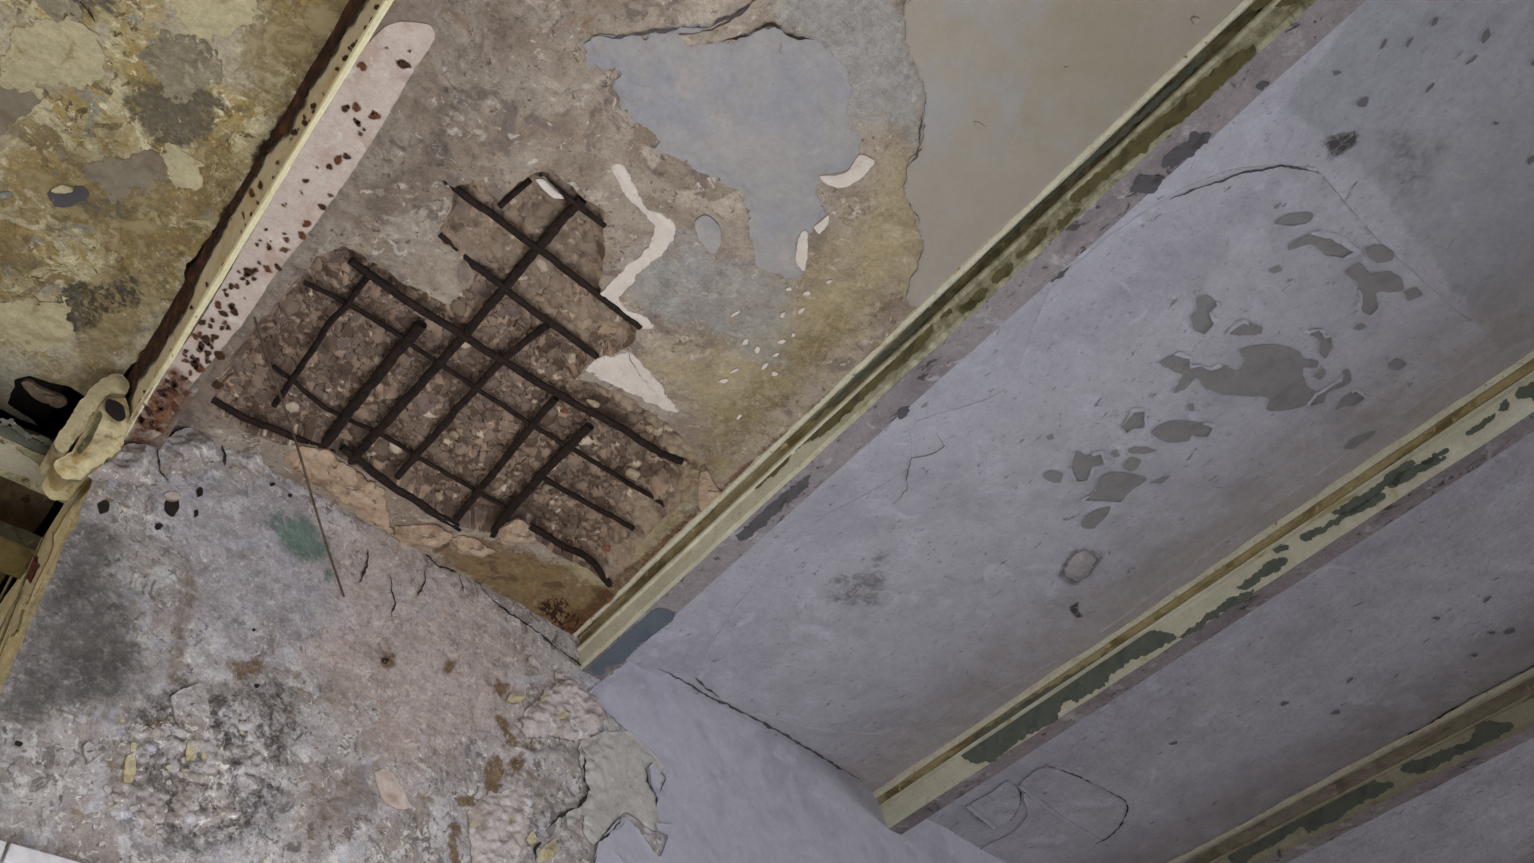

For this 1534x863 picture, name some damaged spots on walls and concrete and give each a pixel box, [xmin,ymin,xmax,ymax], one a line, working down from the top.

flaking render [0,0,107,135]
flaking render [139,0,264,105]
corrosion [124,0,381,446]
spalling [0,21,722,637]
corrosion [386,47,411,69]
flaking render [584,0,875,376]
peeling [755,0,1301,489]
peeling [1043,294,1369,529]
corrosion [560,507,700,637]
peeling [961,448,1449,764]
peeling [467,608,1007,863]
crack [1045,764,1129,844]